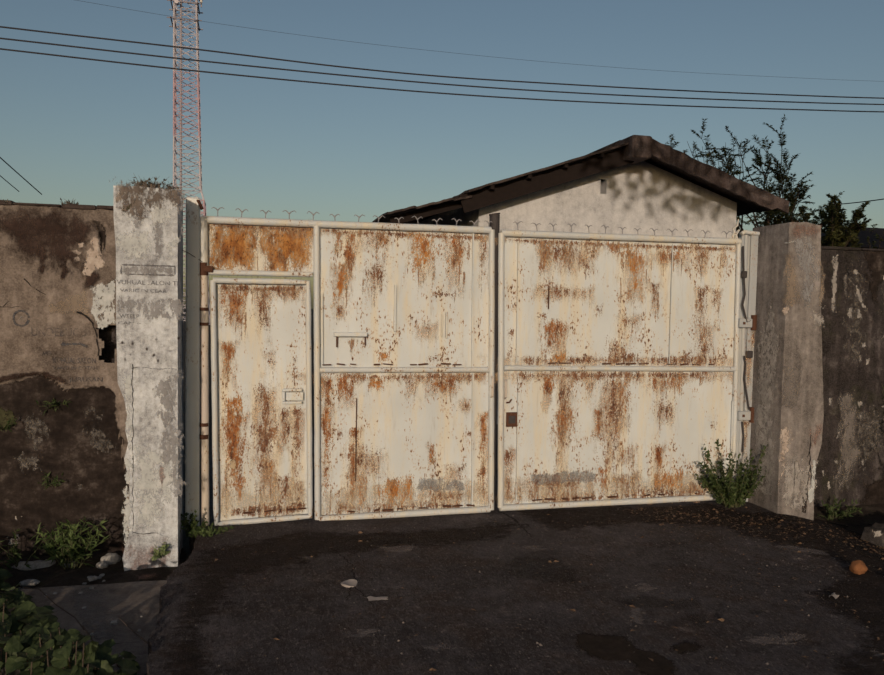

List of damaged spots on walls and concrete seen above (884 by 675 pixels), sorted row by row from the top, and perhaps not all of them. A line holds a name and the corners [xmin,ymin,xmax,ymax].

leakage [0,208,99,314]
peeling [73,223,184,363]
leakage [116,180,185,275]
leakage [818,254,847,310]
peeling [841,257,884,367]
leakage [864,245,884,312]
spalling [0,371,181,558]
leakage [833,393,862,487]